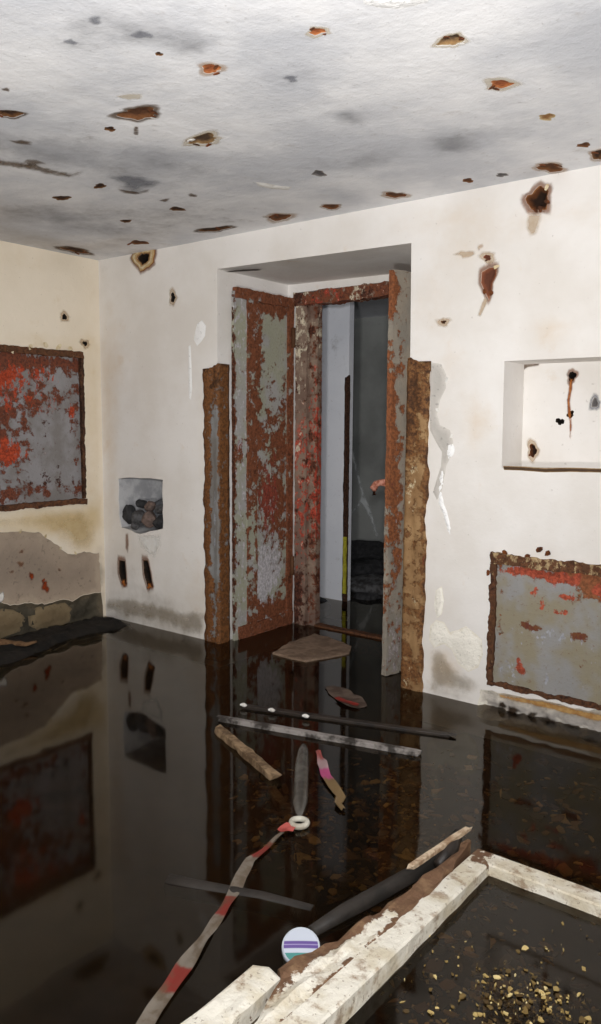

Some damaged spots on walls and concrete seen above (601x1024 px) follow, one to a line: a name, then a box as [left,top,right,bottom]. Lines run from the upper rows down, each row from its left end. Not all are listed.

spalling [432,33,467,47]
spalling [486,78,518,91]
spalling [0,110,26,119]
spalling [104,95,159,135]
spalling [184,131,221,147]
spalling [522,163,563,233]
spalling [127,240,156,273]
peeling [430,362,455,533]
flaking render [0,529,103,639]
spalling [118,557,127,587]
spalling [142,557,153,590]
leakage [429,586,483,672]